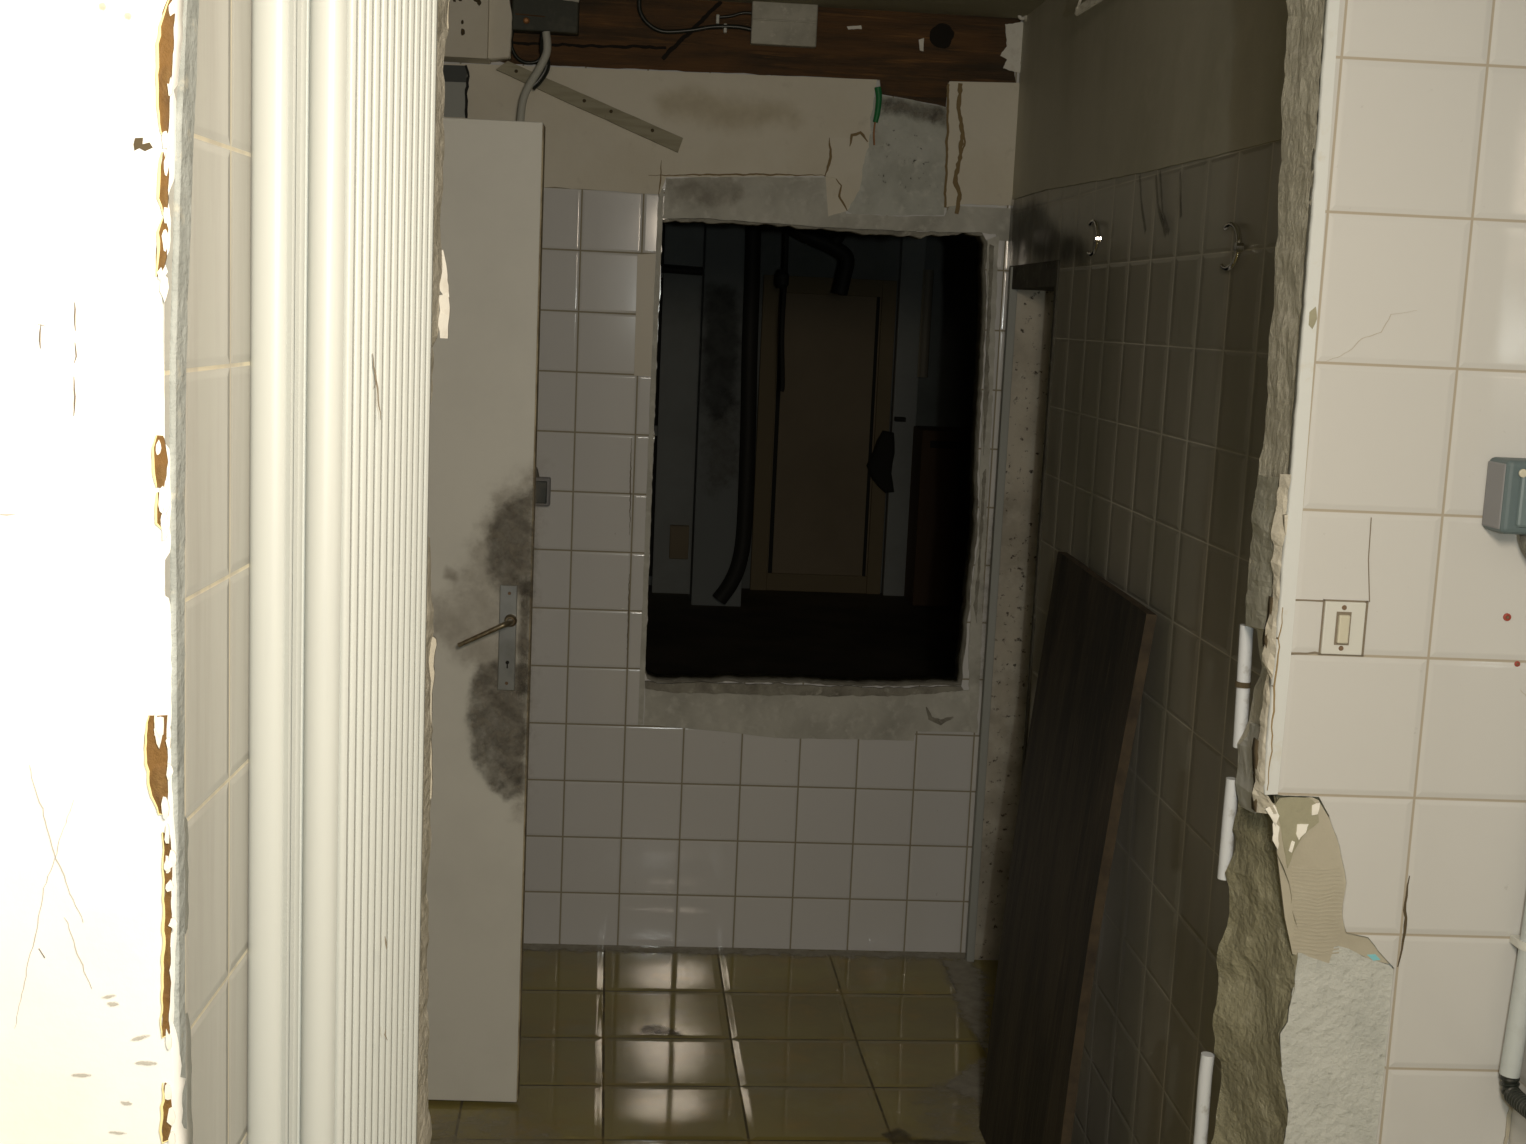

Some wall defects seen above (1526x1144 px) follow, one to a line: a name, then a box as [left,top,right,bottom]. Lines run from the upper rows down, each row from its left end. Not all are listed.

flaking render [662,95,982,239]
crack [943,83,966,214]
spalling [1211,474,1393,1144]